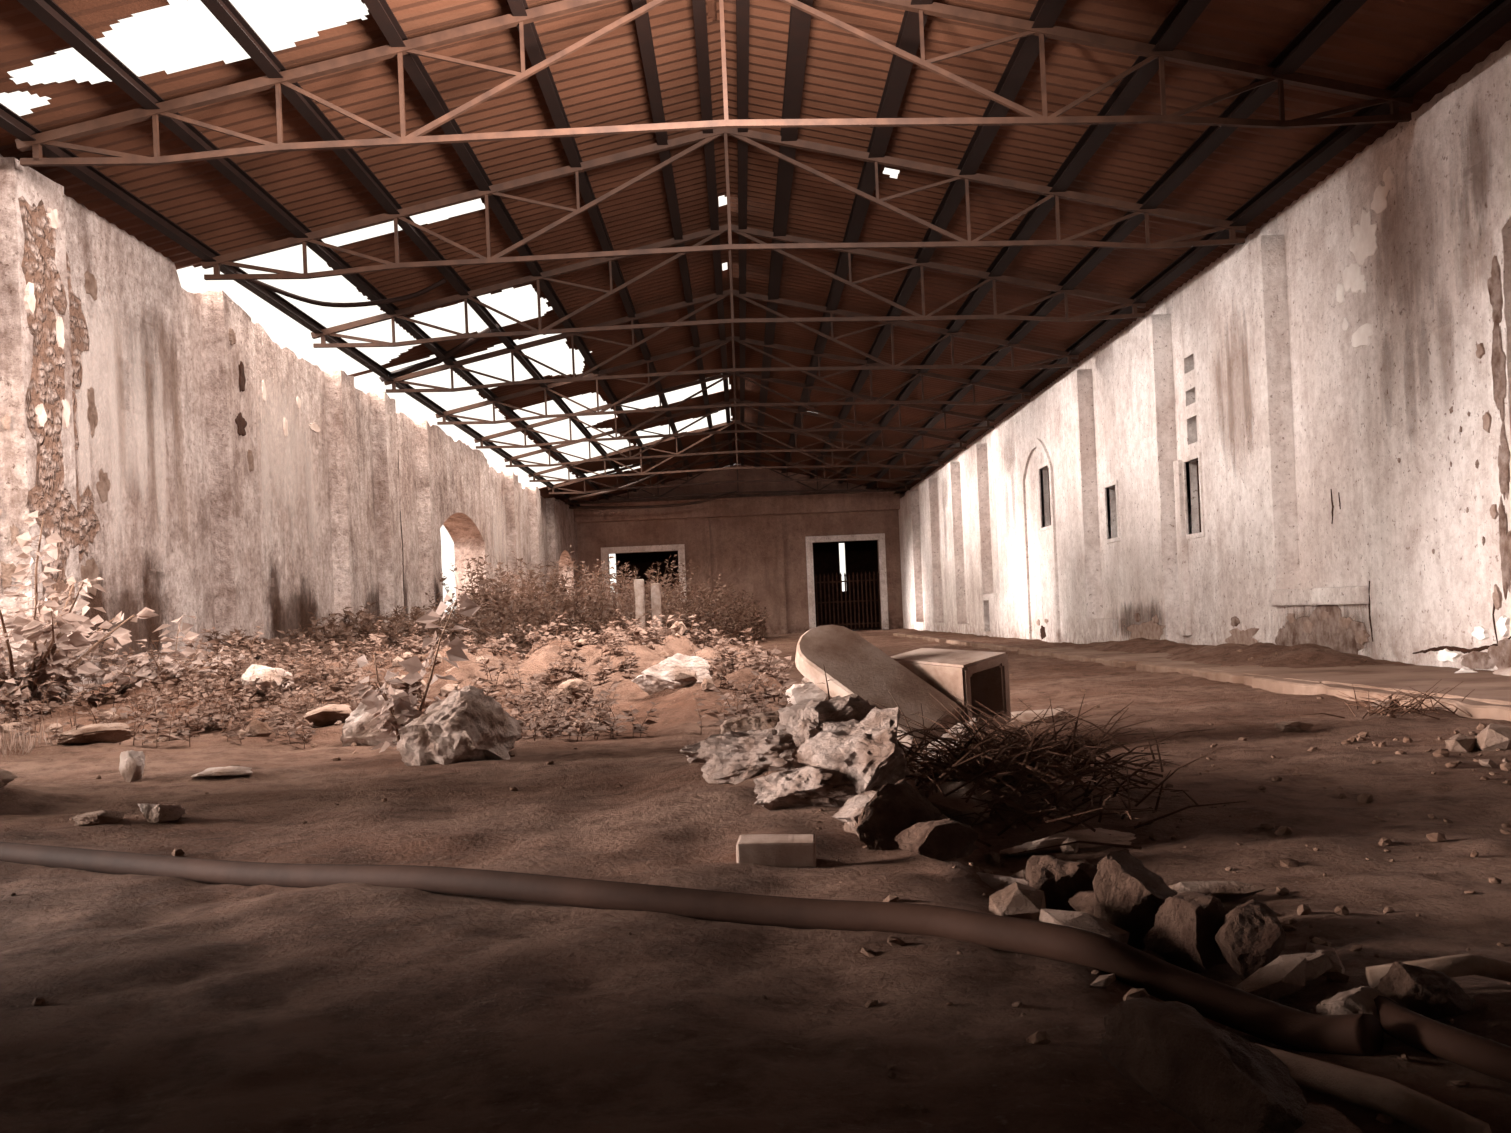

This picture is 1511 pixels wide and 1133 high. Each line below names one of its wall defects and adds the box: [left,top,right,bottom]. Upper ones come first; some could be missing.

spalling [1437,255,1511,670]